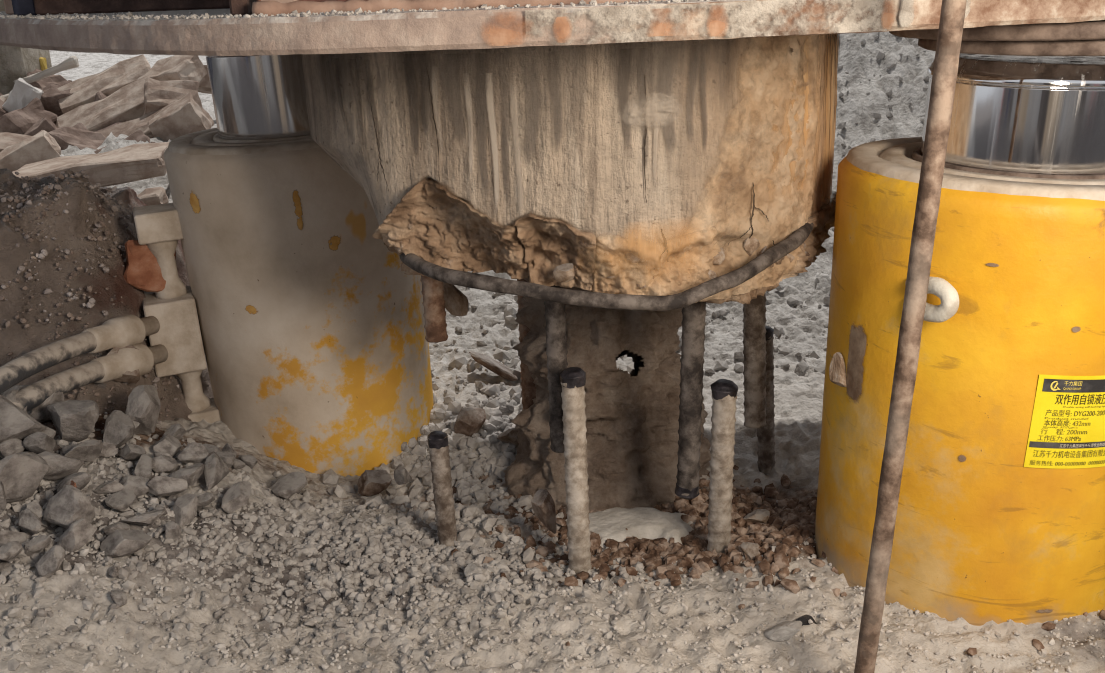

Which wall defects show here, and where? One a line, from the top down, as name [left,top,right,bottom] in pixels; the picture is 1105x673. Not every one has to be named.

water stain [322,53,379,157]
water stain [400,48,561,206]
rust [486,16,524,46]
water stain [614,41,678,178]
water stain [688,40,707,144]
spalling [372,35,837,574]